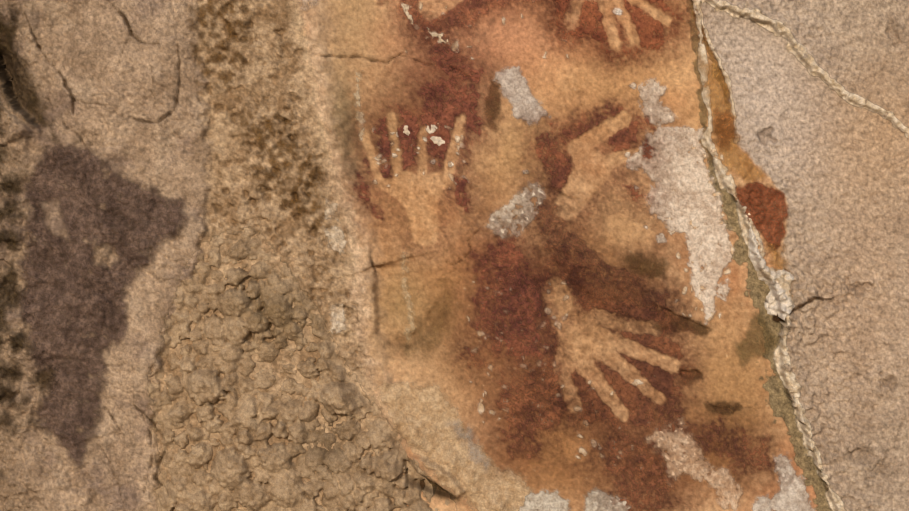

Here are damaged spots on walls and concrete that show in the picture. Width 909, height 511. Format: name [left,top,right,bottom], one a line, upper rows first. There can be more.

spalling [493,66,550,125]
spalling [487,170,546,238]
spalling [625,79,732,324]
crack [687,0,909,511]
spalling [646,417,743,511]
spalling [752,455,815,511]